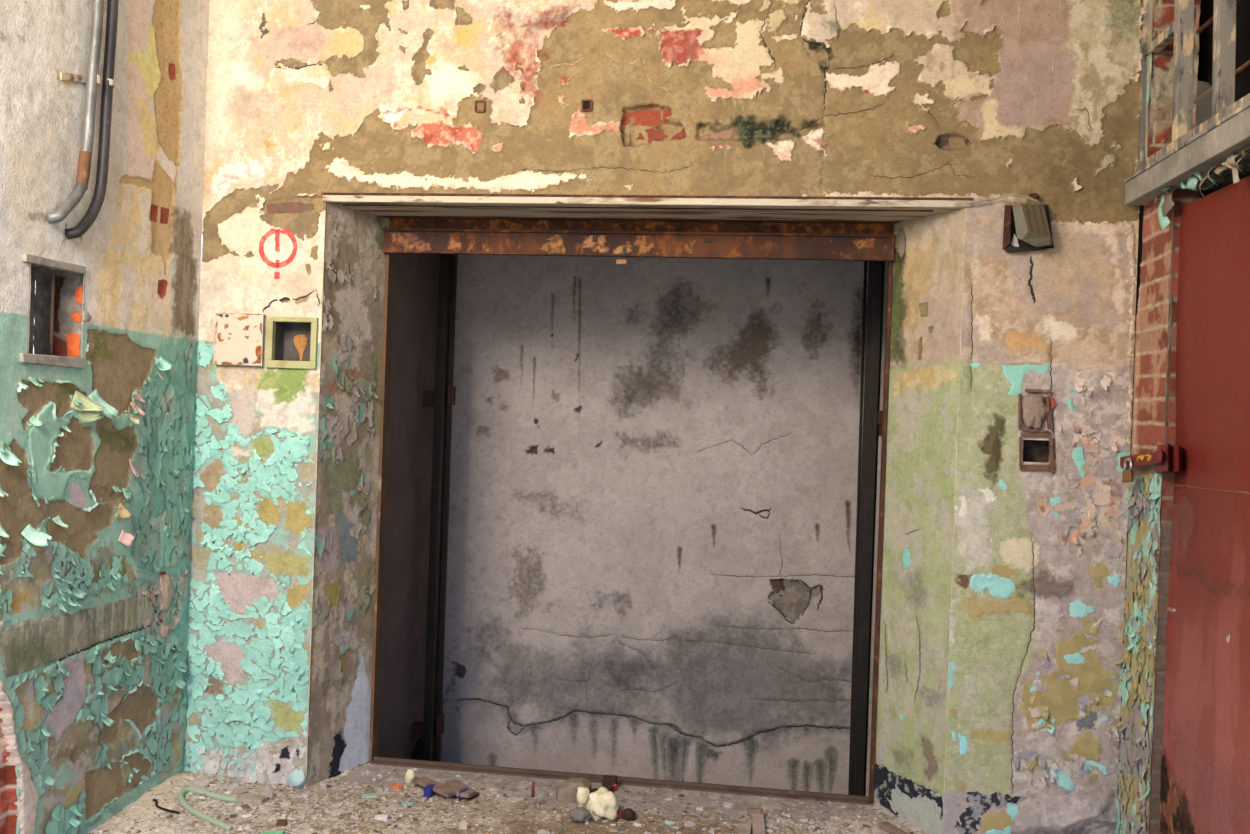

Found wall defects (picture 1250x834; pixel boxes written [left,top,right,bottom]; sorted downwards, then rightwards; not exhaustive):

corrosion [539,235,566,253]
corrosion [581,235,658,255]
corrosion [321,193,973,223]
crack [1028,256,1036,303]
peeling [1179,148,1250,198]
damp [614,283,697,413]
damp [711,311,775,391]
flaking render [200,0,1175,834]
peeling [0,290,378,834]
crack [457,508,855,747]
damp [501,621,842,760]
corrosion [1143,649,1194,834]